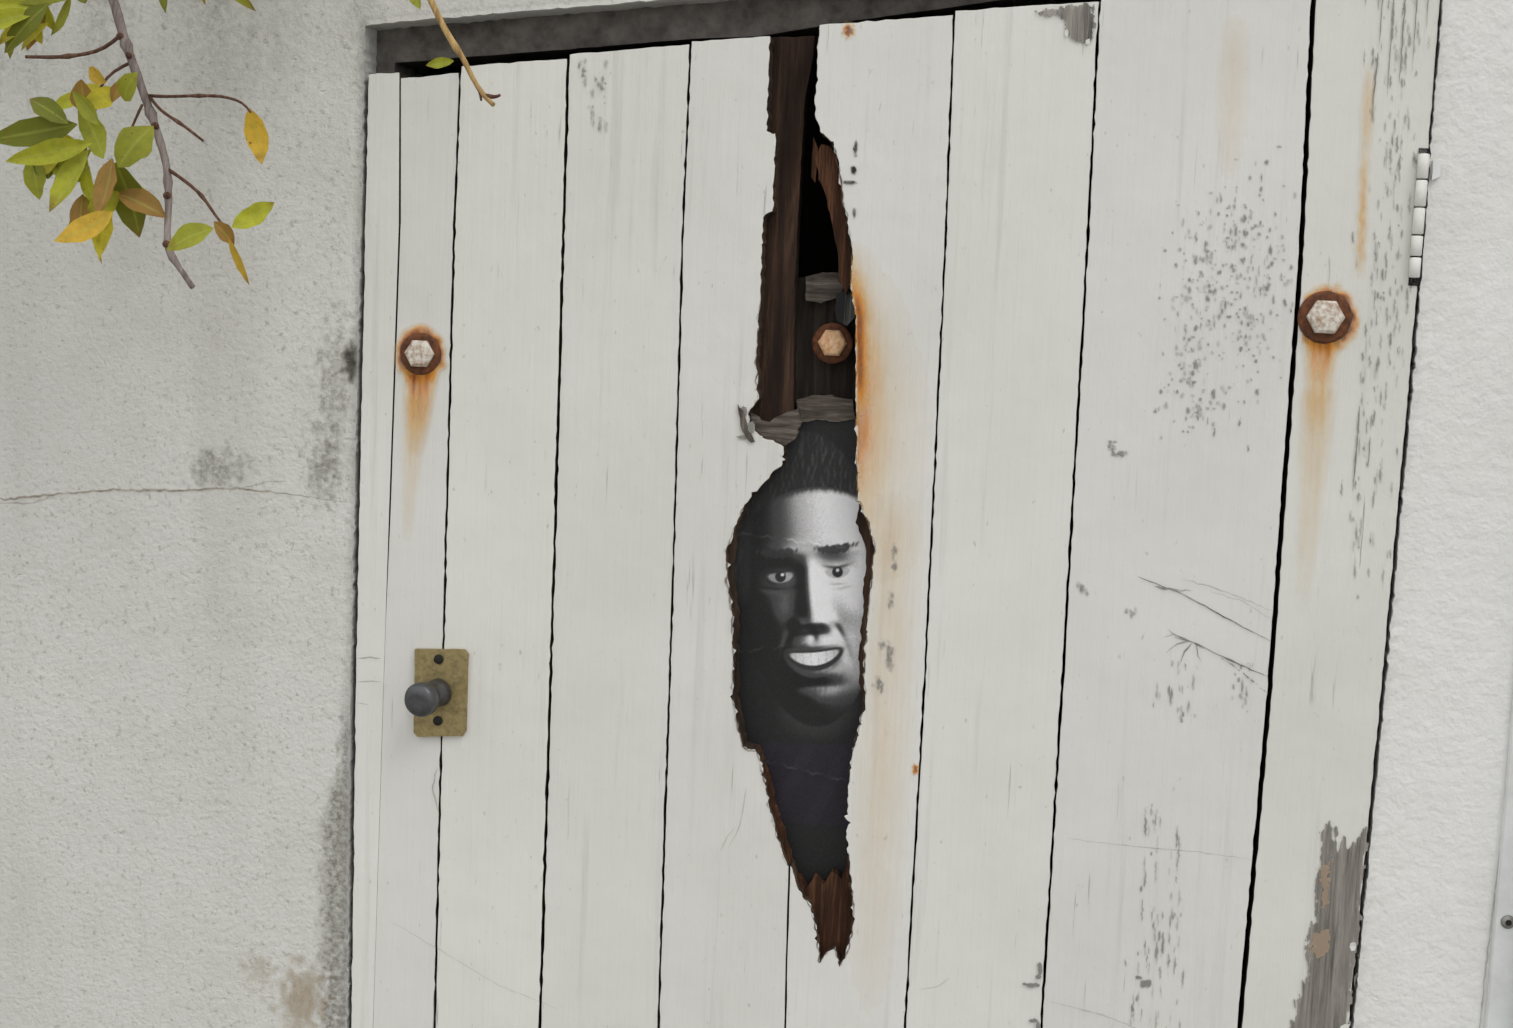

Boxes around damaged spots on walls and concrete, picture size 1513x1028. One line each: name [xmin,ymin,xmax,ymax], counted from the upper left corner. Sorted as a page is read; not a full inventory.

peeling [1035,2,1096,44]
rust [397,326,444,416]
rust [852,283,870,463]
rust [1302,287,1358,383]
peeling [1290,821,1369,1028]